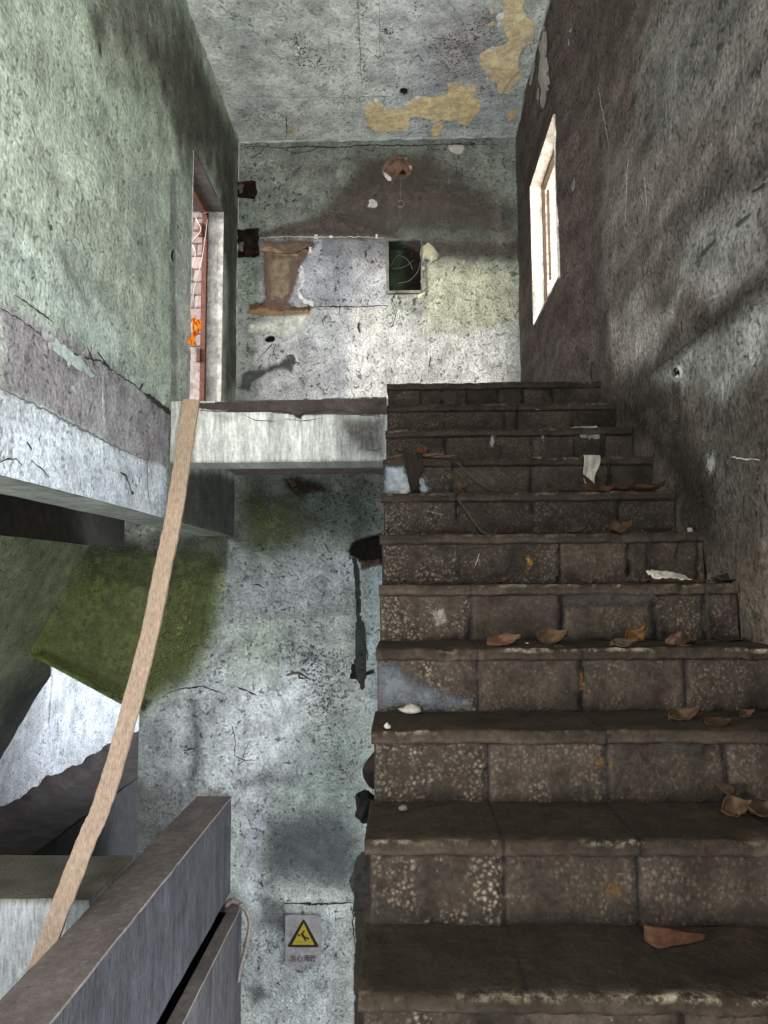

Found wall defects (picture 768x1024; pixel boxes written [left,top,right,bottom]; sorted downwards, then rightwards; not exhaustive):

peeling [475,0,550,121]
peeling [362,82,481,137]
crack [1,295,55,336]
crack [74,347,171,415]